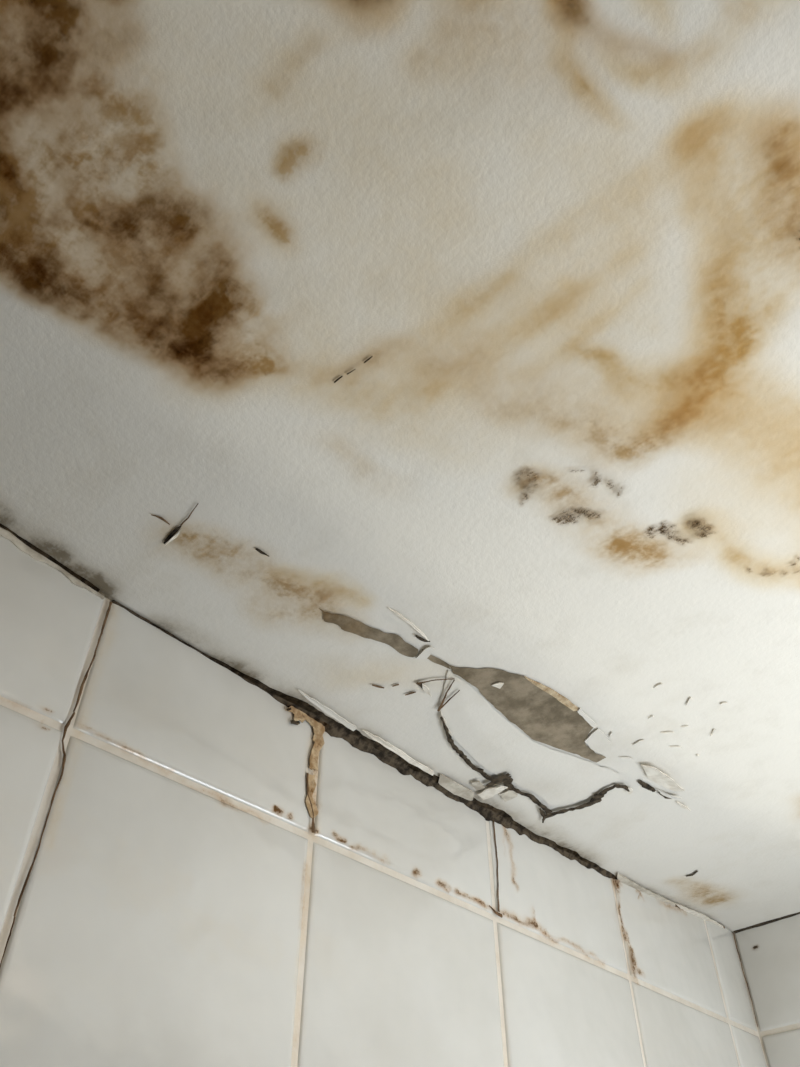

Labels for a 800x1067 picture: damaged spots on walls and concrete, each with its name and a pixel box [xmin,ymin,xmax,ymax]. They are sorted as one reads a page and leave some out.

damp [31,0,79,68]
damp [22,265,60,290]
damp [175,279,234,357]
crack [151,504,198,545]
peeling [319,607,691,811]
crack [0,517,800,1027]